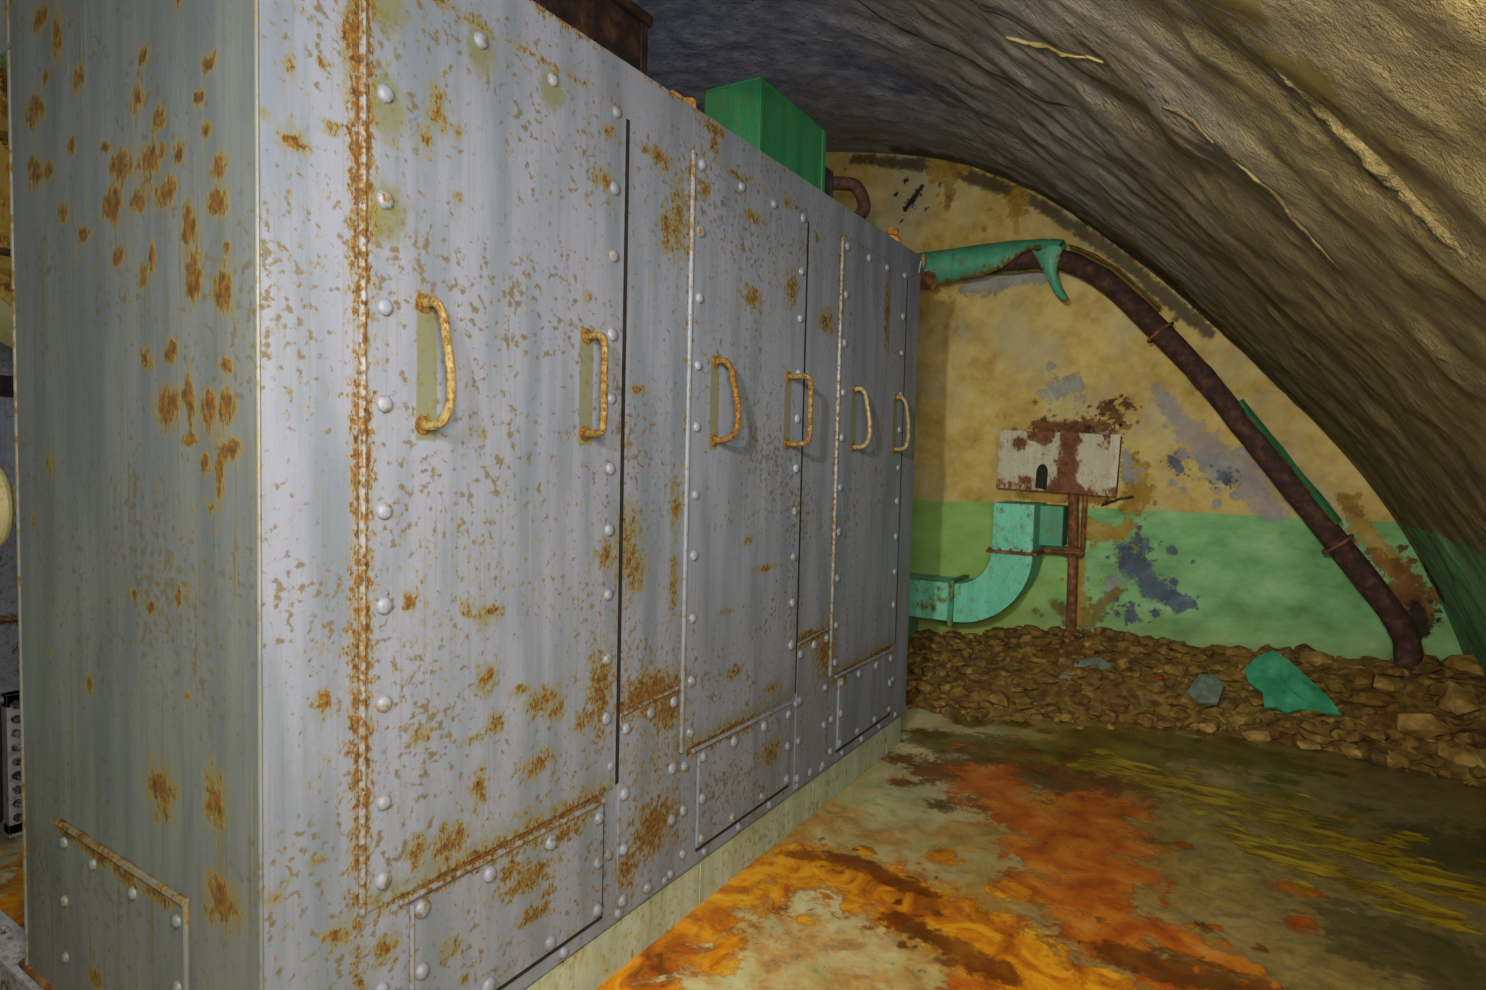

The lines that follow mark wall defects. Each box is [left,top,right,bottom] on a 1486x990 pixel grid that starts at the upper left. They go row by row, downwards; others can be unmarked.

peeling [1160,447,1267,508]
peeling [1086,525,1199,626]
rust [596,728,1283,990]
rust [1263,877,1325,936]